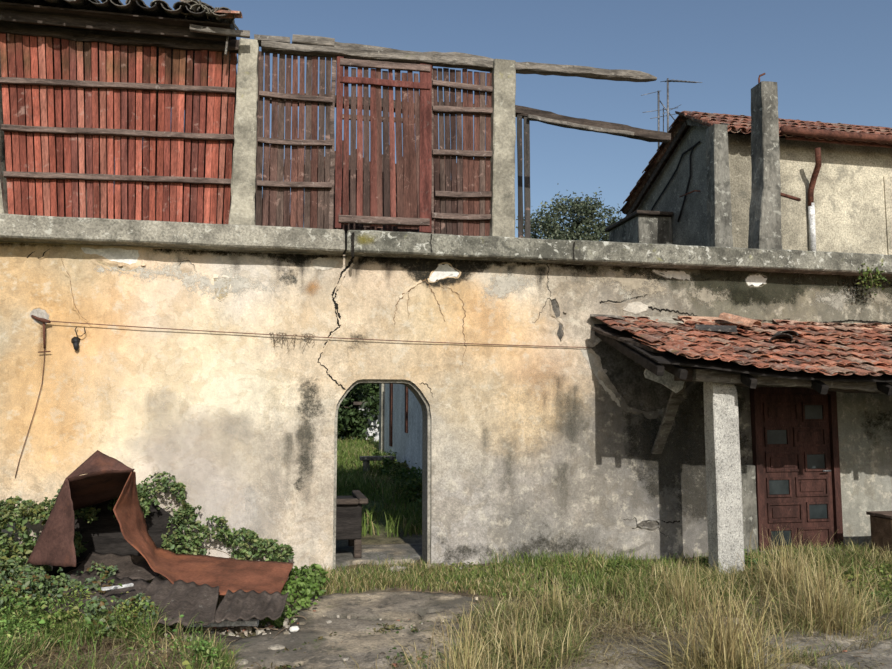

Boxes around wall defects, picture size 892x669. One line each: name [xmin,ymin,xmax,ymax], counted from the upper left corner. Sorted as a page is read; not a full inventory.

crack [317,232,355,390]
crack [393,279,467,366]
peeling [427,262,461,283]
peeling [745,273,768,287]
water stain [287,381,322,490]
spalling [636,516,660,531]